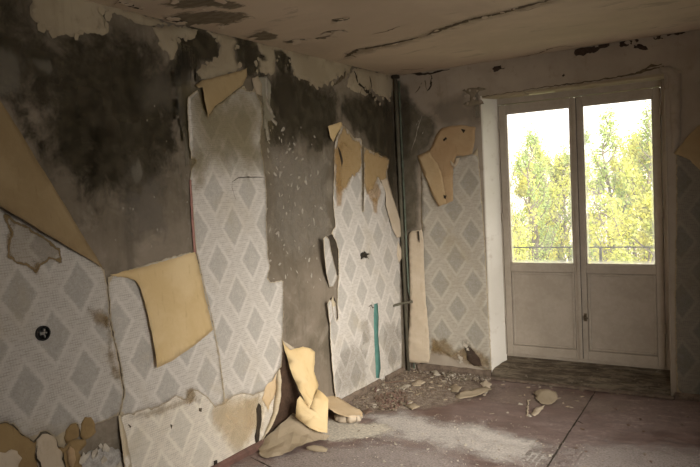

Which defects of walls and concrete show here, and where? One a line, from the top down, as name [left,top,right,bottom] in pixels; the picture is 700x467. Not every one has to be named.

peeling [0,101,103,268]
water stain [0,3,219,193]
peeling [29,0,394,116]
water stain [236,37,434,232]
crack [333,0,549,111]
peeling [418,125,476,206]
flaking render [571,39,648,56]
water stain [3,214,62,273]
peeling [112,252,213,368]
water stain [433,340,489,366]